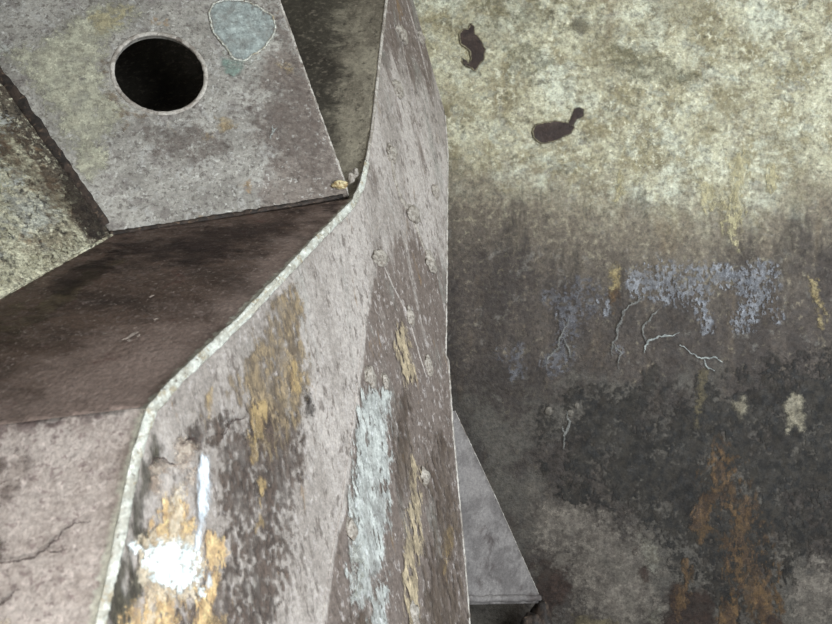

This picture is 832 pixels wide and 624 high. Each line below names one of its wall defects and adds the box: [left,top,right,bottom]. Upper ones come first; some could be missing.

water stain [627,259,776,333]
crack [545,318,571,366]
crack [611,296,722,371]
rust [227,283,313,464]
water stain [166,484,184,542]
water stain [180,409,234,549]
water stain [393,322,424,624]
water stain [558,476,590,508]
crack [0,521,90,564]
water stain [349,585,390,624]
water stain [530,561,573,616]